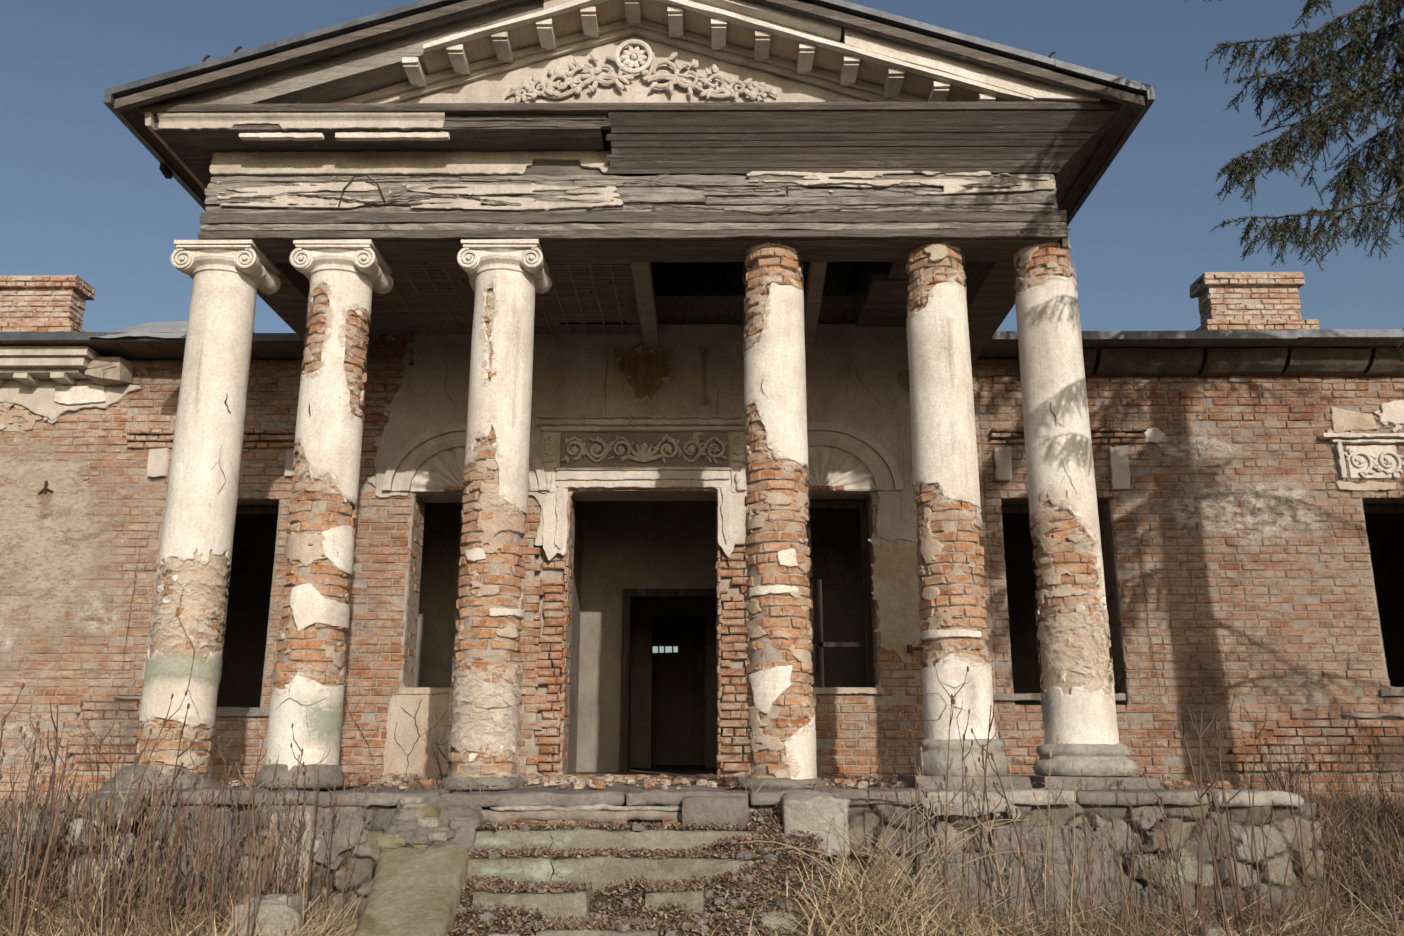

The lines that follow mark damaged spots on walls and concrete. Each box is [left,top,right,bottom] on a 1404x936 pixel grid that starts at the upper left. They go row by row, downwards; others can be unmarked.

peeling [217,181,623,211]
peeling [746,171,1056,195]
flaking render [0,385,106,429]
flaking render [300,281,413,487]
flaking render [1327,400,1404,433]
flaking render [148,550,231,663]
flaking render [270,439,358,693]
flaking render [445,420,571,778]
flaking render [715,399,844,779]
flaking render [868,483,992,670]
flaking render [1030,489,1115,698]
spalling [61,694,216,778]